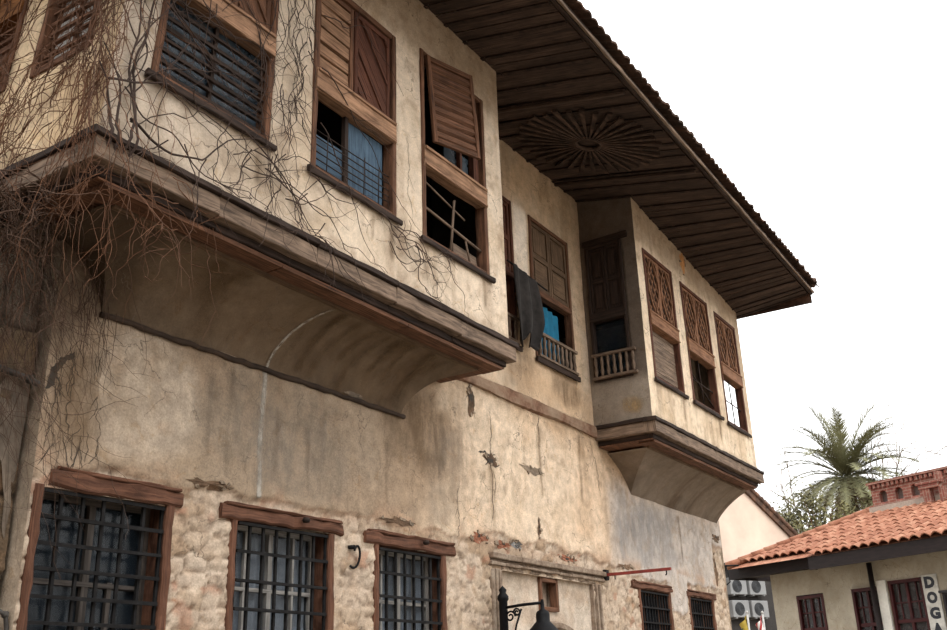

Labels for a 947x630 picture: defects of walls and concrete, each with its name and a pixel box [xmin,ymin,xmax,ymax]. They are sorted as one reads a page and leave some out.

flaking render [482,453,497,467]
peeling [520,463,544,476]
peeling [186,477,234,491]
peeling [379,515,415,526]
flaking render [469,529,522,551]